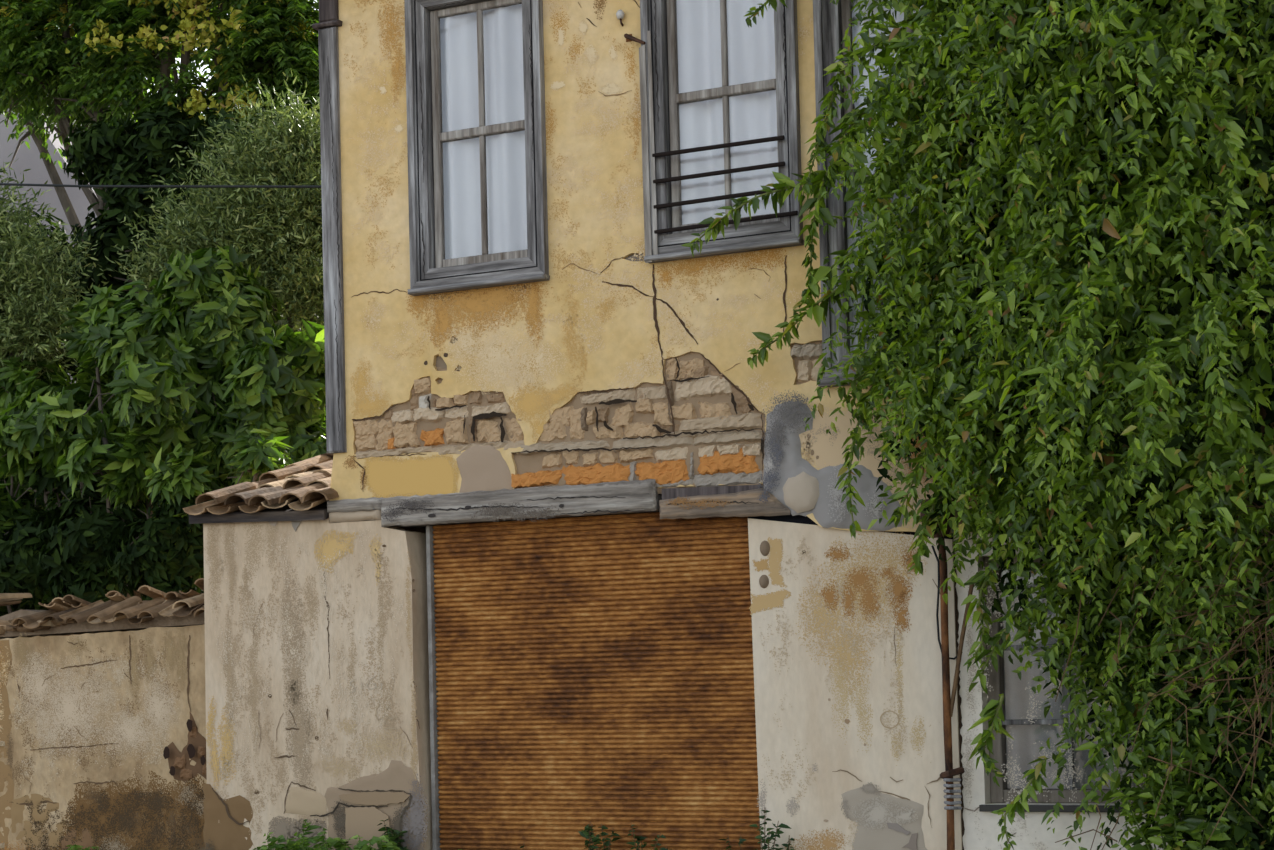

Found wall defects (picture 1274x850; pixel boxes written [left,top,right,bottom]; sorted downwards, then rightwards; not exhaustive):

spalling [353,338,766,494]
crack [562,257,758,411]
spalling [790,341,823,385]
damp [0,622,188,769]
damp [45,508,419,850]
damp [890,623,926,766]
spalling [163,712,260,850]
spalling [310,760,429,850]